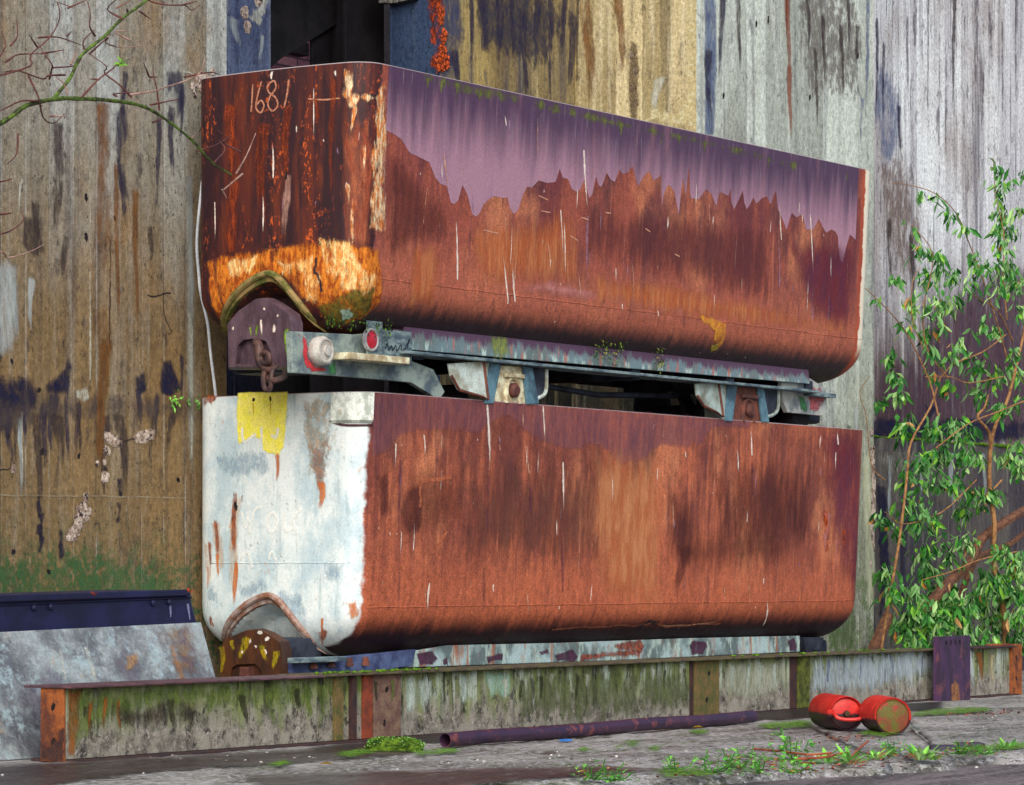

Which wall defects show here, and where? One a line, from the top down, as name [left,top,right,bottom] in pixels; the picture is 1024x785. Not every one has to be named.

corrosion [97,102,119,235]
leakage [116,72,128,214]
leakage [155,71,184,201]
corrosion [428,0,453,72]
leakage [439,0,577,93]
leakage [799,0,922,294]
leakage [906,0,929,83]
leakage [937,0,1018,143]
leakage [0,362,128,501]
corrosion [96,342,110,455]
leakage [391,676,436,711]
leakage [487,673,554,705]